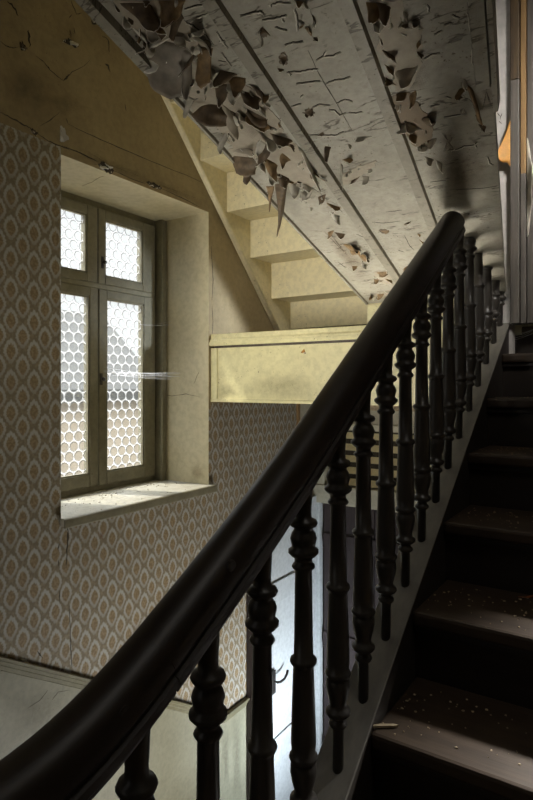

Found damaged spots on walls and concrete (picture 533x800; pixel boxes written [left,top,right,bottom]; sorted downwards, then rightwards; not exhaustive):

crack [4,2,110,80]
peeling [112,0,393,301]
crack [240,1,363,137]
peeling [366,0,444,174]